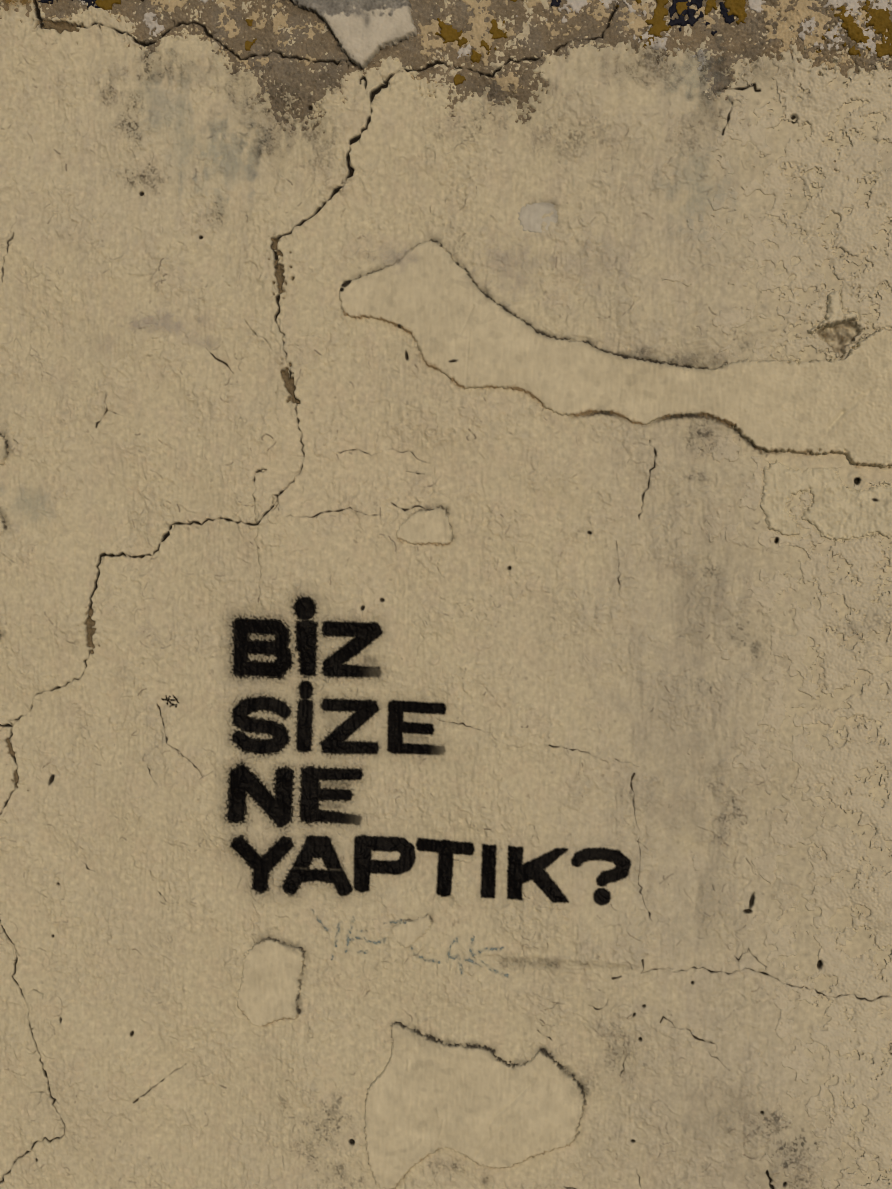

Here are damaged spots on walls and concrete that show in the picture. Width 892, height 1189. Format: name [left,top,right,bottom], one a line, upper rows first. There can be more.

flaking render [0,0,892,361]
crack [0,0,618,807]
crack [0,920,23,995]
crack [0,1024,65,1182]
peeling [713,491,892,1189]